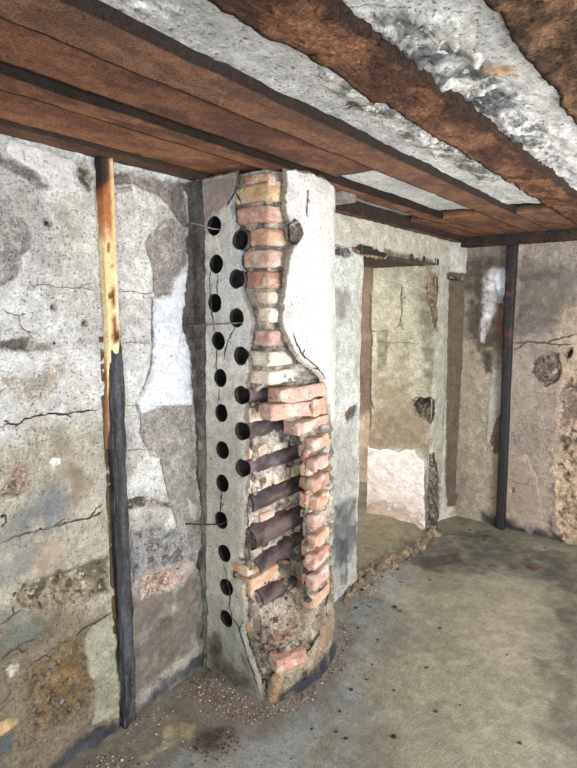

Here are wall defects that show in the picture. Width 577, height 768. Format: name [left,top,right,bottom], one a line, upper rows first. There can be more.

spalling [285,219,304,245]
crack [293,336,326,380]
leakage [466,258,506,445]
crack [513,334,575,350]
crack [3,409,97,429]
spalling [410,396,438,423]
spalling [530,352,577,545]
crack [0,505,104,544]